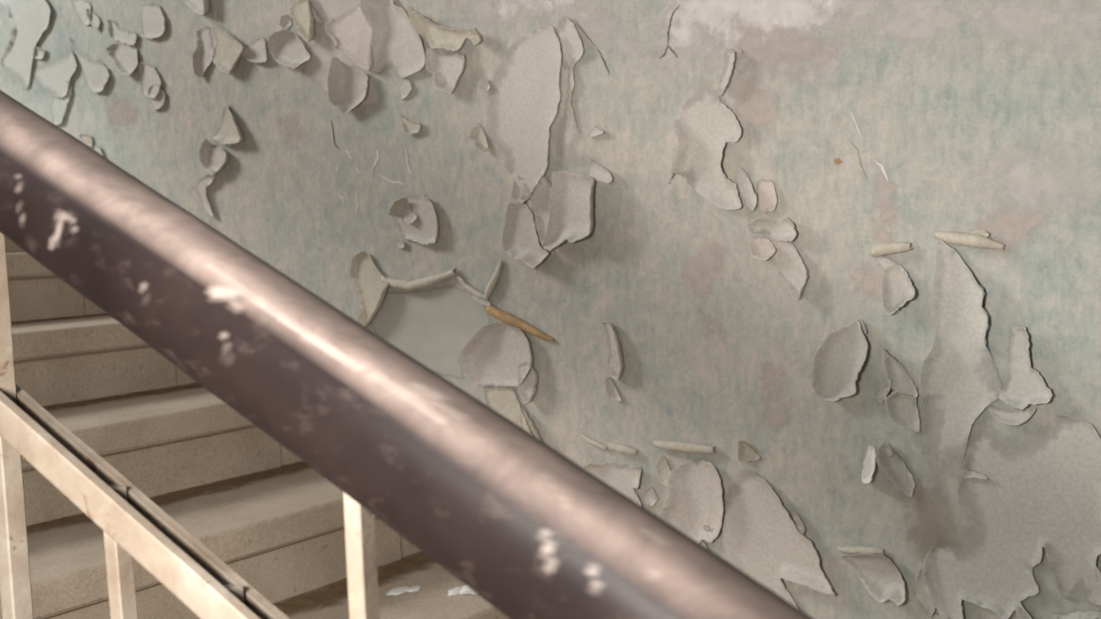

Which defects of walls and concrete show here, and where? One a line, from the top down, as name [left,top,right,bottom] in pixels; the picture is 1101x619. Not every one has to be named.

peeling [0,0,166,126]
peeling [183,0,482,115]
crack [660,5,680,59]
peeling [79,134,104,156]
peeling [194,104,244,218]
peeling [349,17,613,441]
peeling [667,47,809,300]
peeling [811,319,868,402]
peeling [837,230,1101,619]
peeling [580,434,835,608]